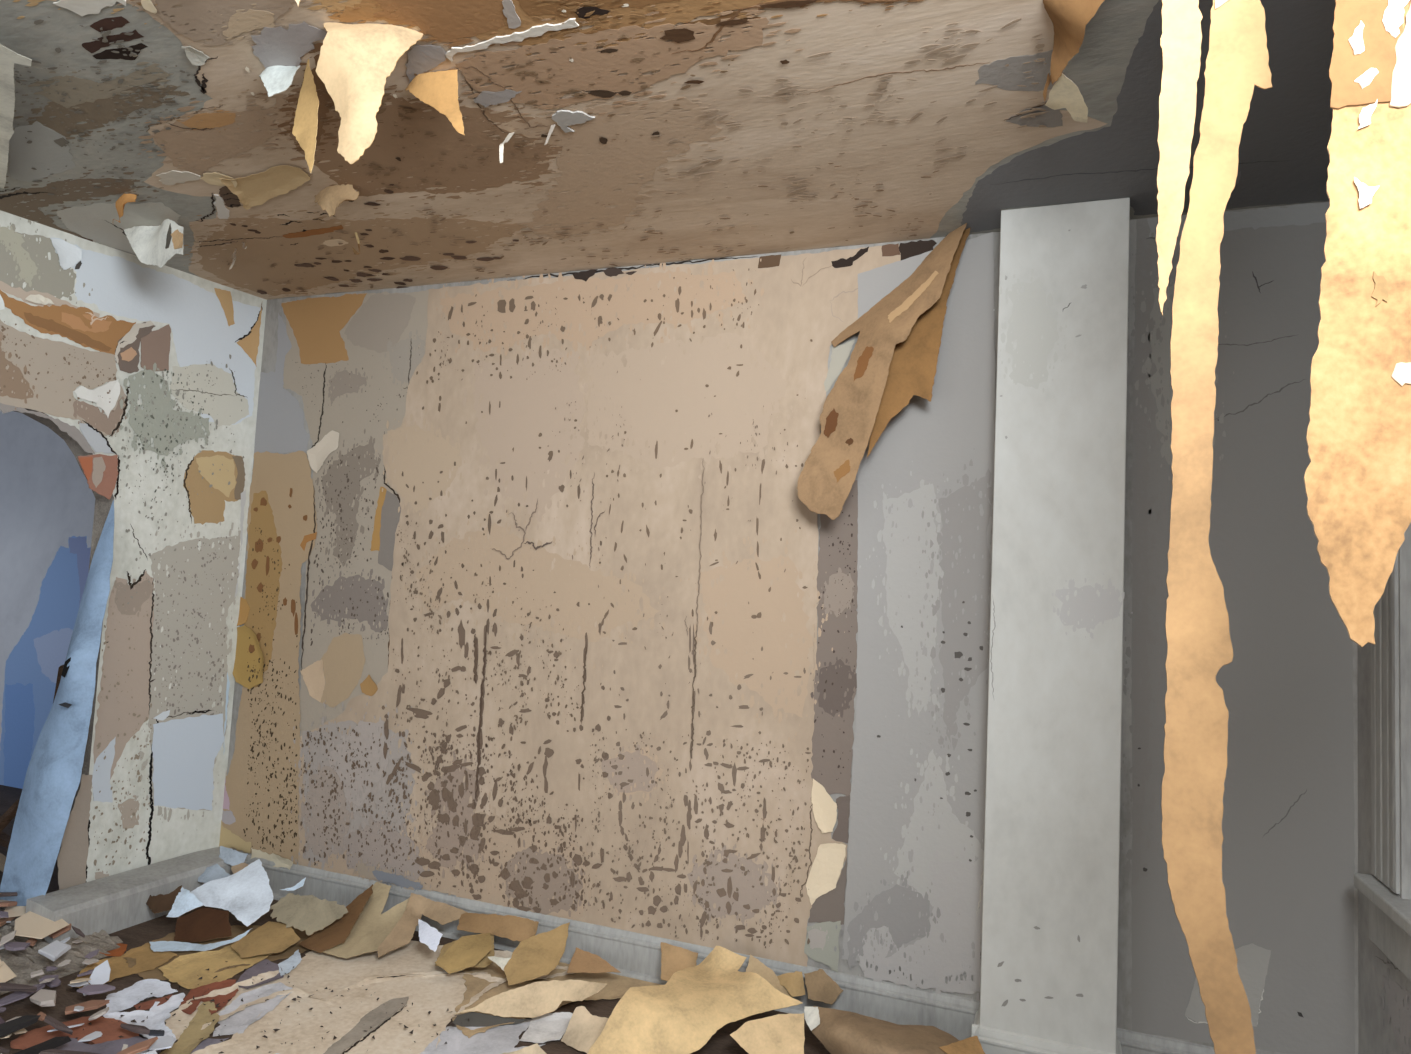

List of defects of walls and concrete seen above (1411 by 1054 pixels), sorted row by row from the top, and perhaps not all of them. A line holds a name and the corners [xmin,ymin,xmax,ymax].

peeling [25,294,54,305]
flaking render [78,423,118,500]
flaking render [92,490,264,825]
flaking render [50,202,339,473]
peeling [156,165,310,219]
flaking render [405,45,447,83]
crack [492,499,552,559]
leakage [0,0,1049,1001]
crack [589,473,605,566]
flaking render [797,0,1213,1043]
leakage [1052,232,1175,886]
flaking render [1208,0,1355,1054]